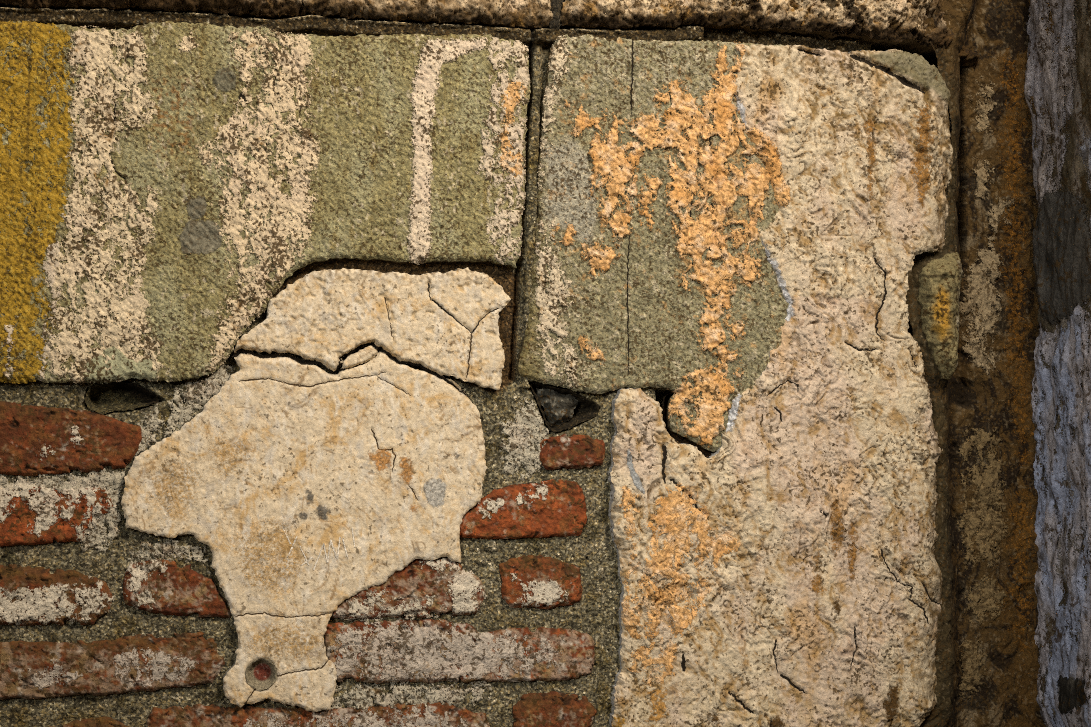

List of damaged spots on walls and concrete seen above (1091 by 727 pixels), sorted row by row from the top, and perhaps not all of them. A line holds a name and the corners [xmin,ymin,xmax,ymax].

crack [850,55,925,94]
crack [845,258,887,351]
crack [232,283,499,397]
crack [760,380,799,426]
crack [881,549,941,624]
crack [679,654,687,671]
crack [773,639,805,693]
crack [850,626,858,666]
crack [728,691,772,726]